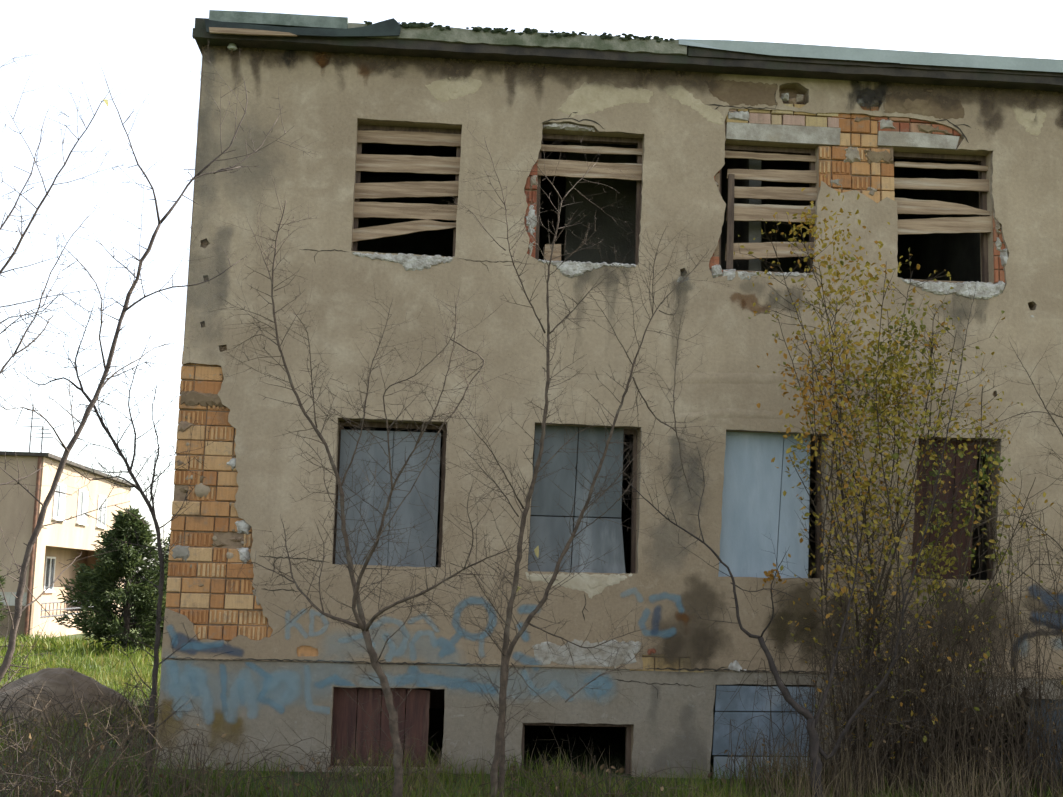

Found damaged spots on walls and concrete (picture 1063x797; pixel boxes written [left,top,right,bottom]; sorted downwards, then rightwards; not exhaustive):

water stain [202,45,721,93]
water stain [849,80,1063,129]
spalling [524,160,538,258]
spalling [709,253,751,280]
spalling [922,217,1008,300]
spalling [166,351,273,640]
flaking render [532,639,704,672]